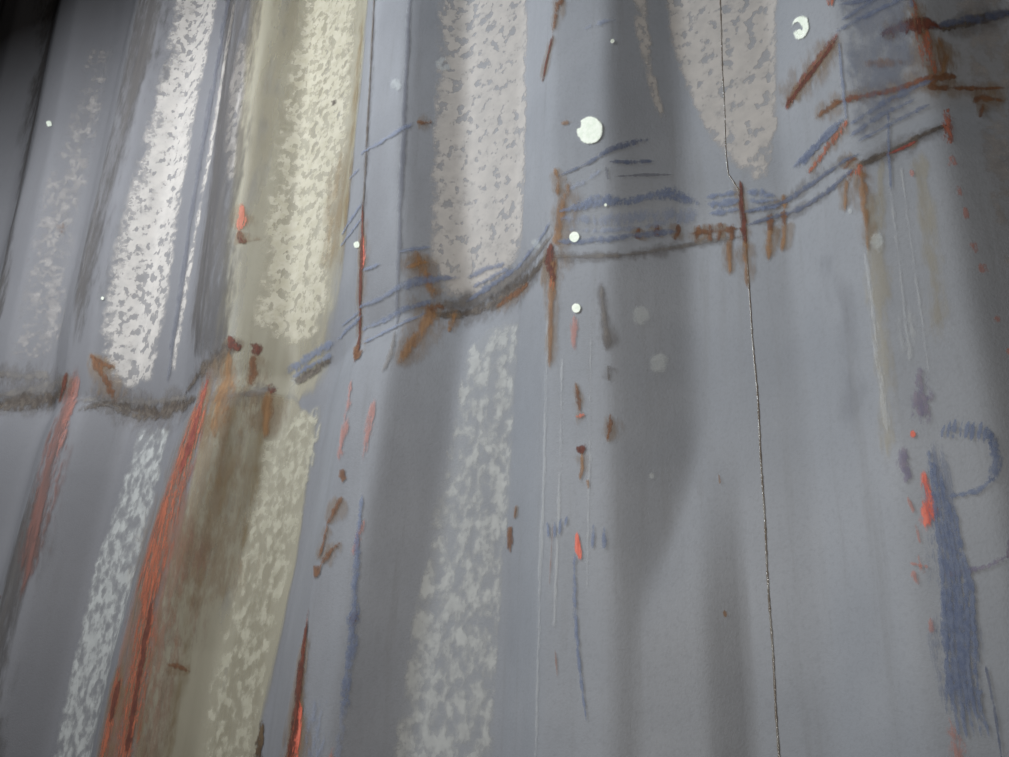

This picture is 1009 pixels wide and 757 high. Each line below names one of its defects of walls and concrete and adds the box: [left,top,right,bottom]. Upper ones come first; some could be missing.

rust [542,0,563,81]
rust [786,35,837,108]
rust [817,0,1009,117]
rust [809,121,847,173]
rust [544,169,569,359]
rust [739,182,747,285]
rust [766,196,787,259]
rust [844,157,868,225]
rust [249,356,258,384]
rust [100,353,233,757]
rust [287,624,307,757]